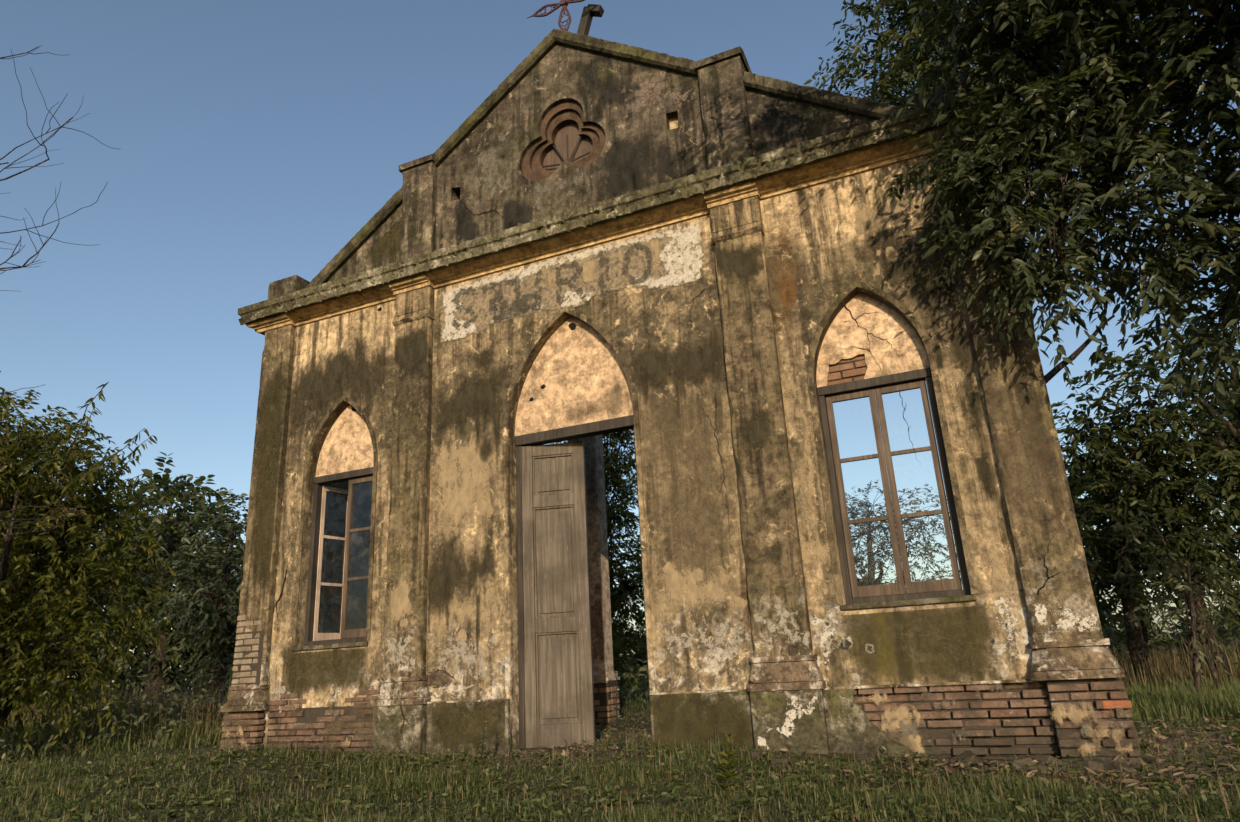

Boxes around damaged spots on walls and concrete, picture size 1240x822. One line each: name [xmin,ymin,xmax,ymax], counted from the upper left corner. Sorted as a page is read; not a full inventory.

damp [601,134,686,197]
damp [455,199,480,243]
damp [503,199,532,230]
spalling [827,355,868,386]
damp [428,540,495,655]
spalling [220,615,380,752]
peeling [758,694,817,750]
spalling [854,678,1141,763]